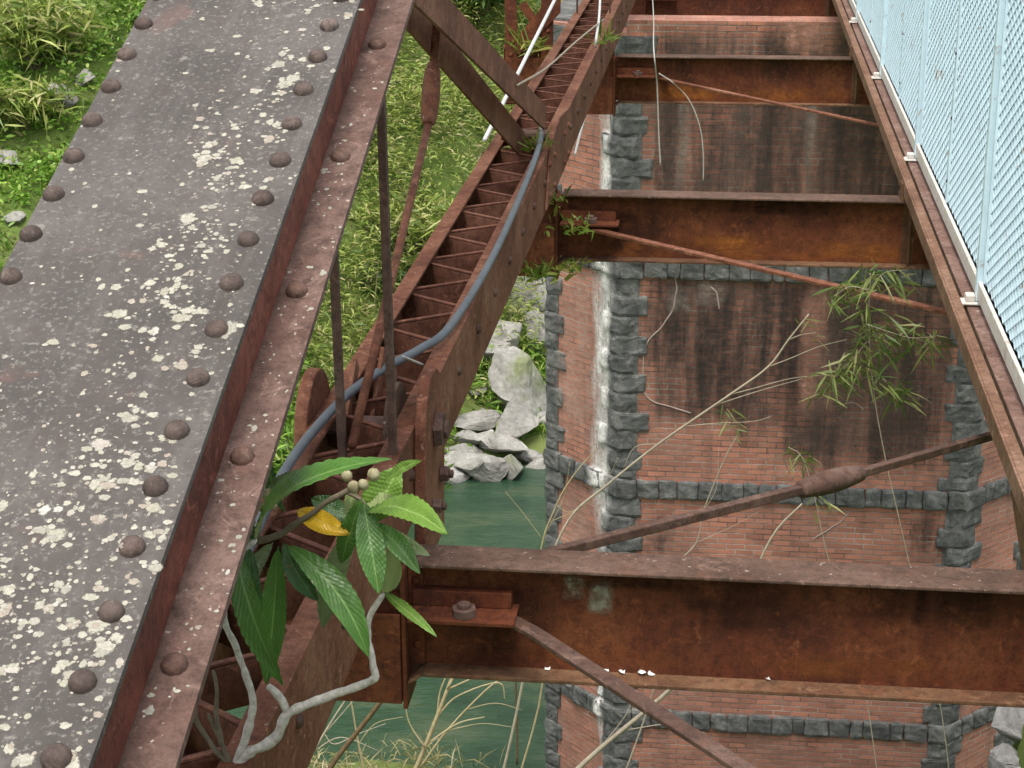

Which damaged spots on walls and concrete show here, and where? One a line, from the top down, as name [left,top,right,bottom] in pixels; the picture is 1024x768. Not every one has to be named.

corrosion [611,216,629,247]
corrosion [755,201,791,213]
water stain [697,288,744,435]
water stain [760,289,796,378]